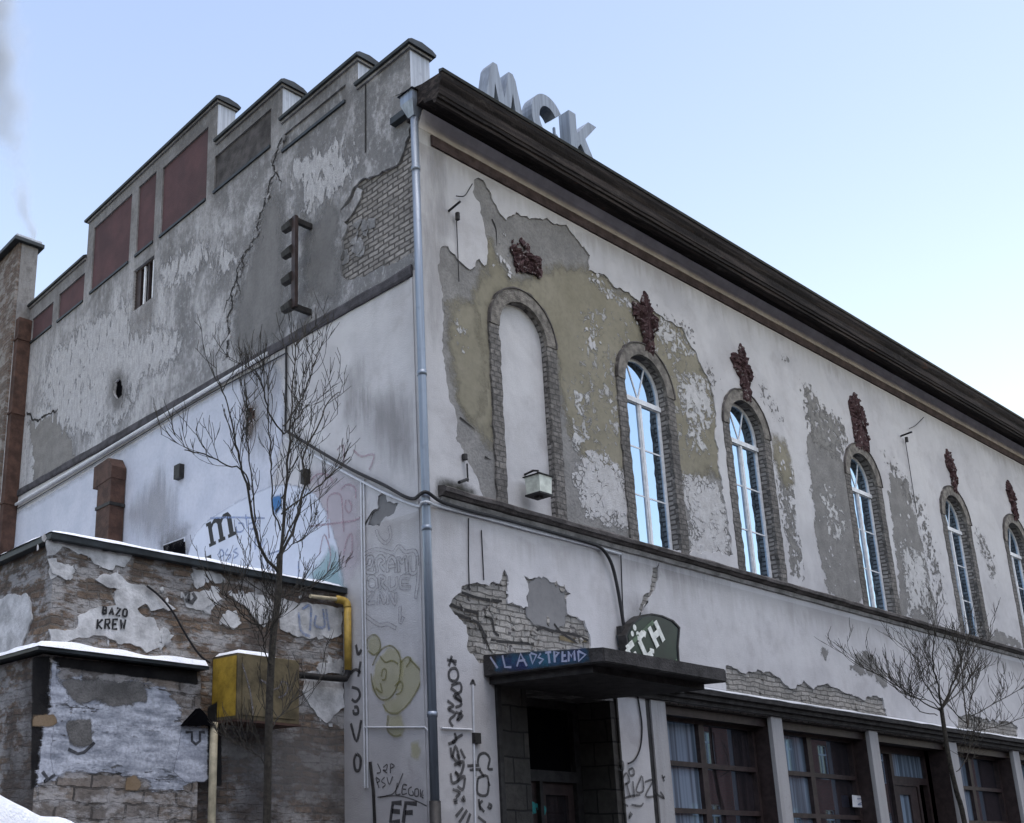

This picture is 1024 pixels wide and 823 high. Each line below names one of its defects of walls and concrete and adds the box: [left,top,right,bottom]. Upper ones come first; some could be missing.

crack [222,135,286,360]
spalling [341,168,396,280]
crack [26,409,58,422]
flaking render [438,178,732,557]
flaking render [0,593,33,653]
flaking render [37,533,344,653]
flaking render [302,655,345,727]
spalling [449,571,590,663]
peeling [773,436,805,580]
spalling [725,650,887,716]
peeling [800,382,863,602]
peeling [883,452,949,626]